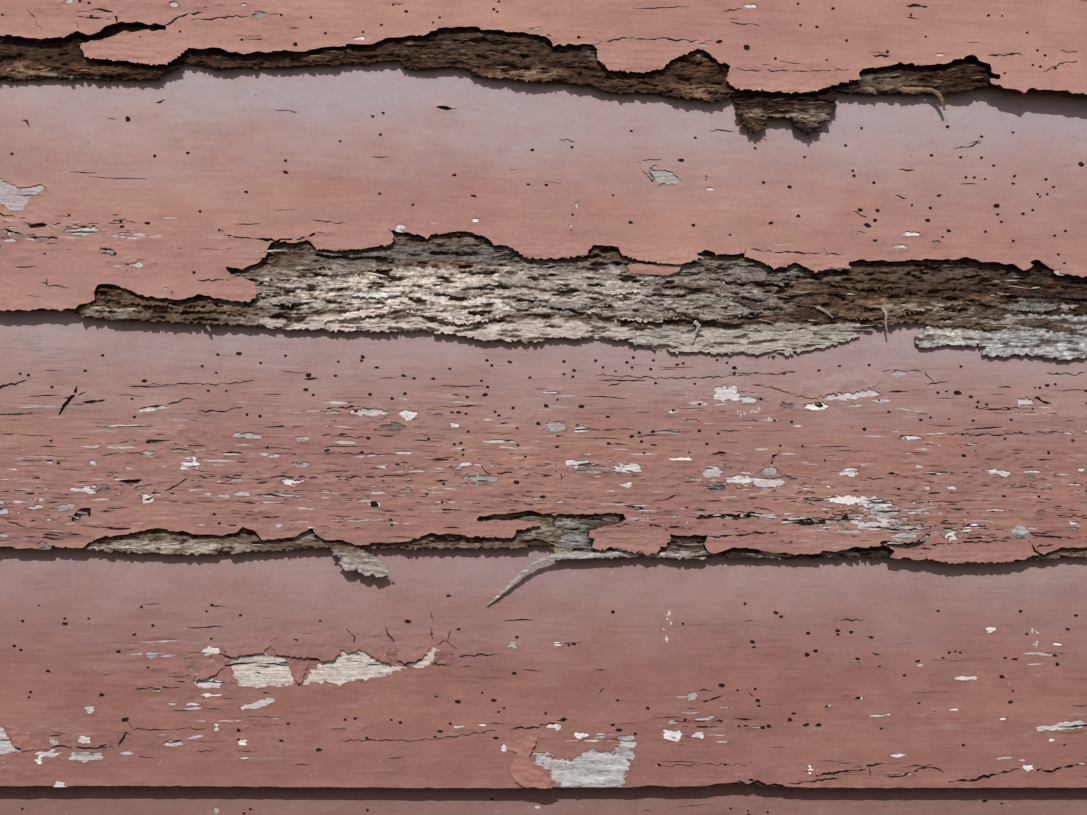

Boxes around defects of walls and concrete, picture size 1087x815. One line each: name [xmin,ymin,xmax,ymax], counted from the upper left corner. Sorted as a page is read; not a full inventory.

peeling [81,31,189,65]
peeling [597,43,708,73]
peeling [726,71,860,94]
peeling [308,224,406,251]
peeling [618,242,704,275]
peeling [738,246,851,273]
peeling [206,279,258,302]
peeling [454,490,589,538]
peeling [321,526,393,577]
peeling [168,631,461,710]
peeling [0,722,107,765]
peeling [501,727,637,789]